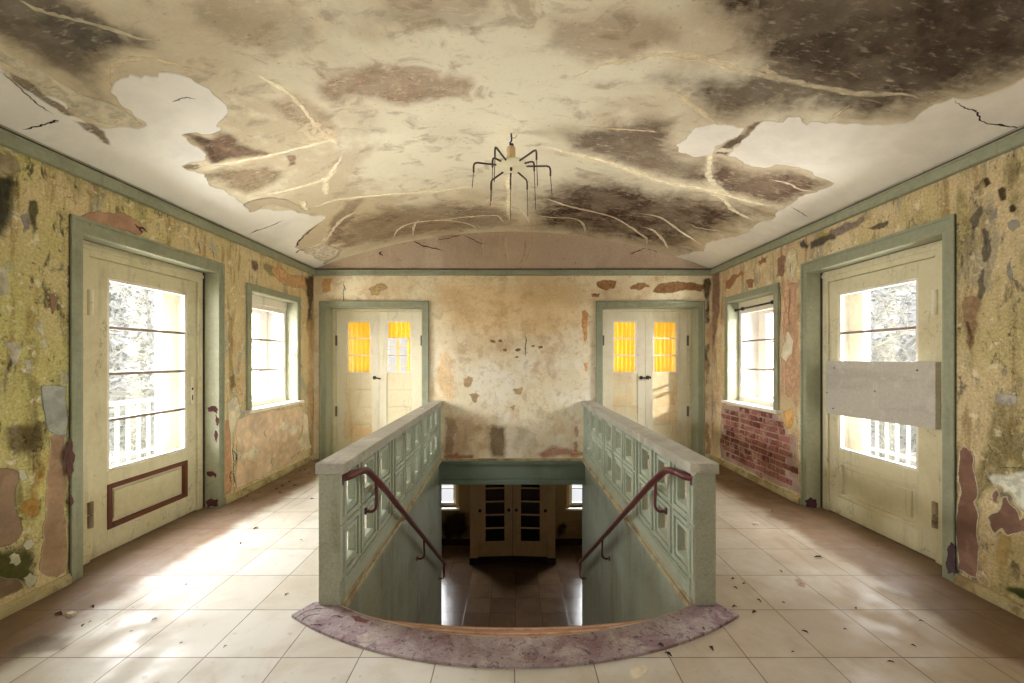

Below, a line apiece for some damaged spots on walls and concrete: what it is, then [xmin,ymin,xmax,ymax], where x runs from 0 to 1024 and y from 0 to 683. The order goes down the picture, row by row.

crack [3,73,58,130]
damp [0,0,139,74]
peeling [0,52,340,268]
damp [339,205,508,242]
damp [539,186,741,246]
damp [576,122,820,202]
peeling [674,78,1024,281]
damp [703,0,1024,112]
crack [955,101,1018,128]
peeling [206,395,311,508]
flaking render [719,404,817,508]
spalling [945,447,1024,578]